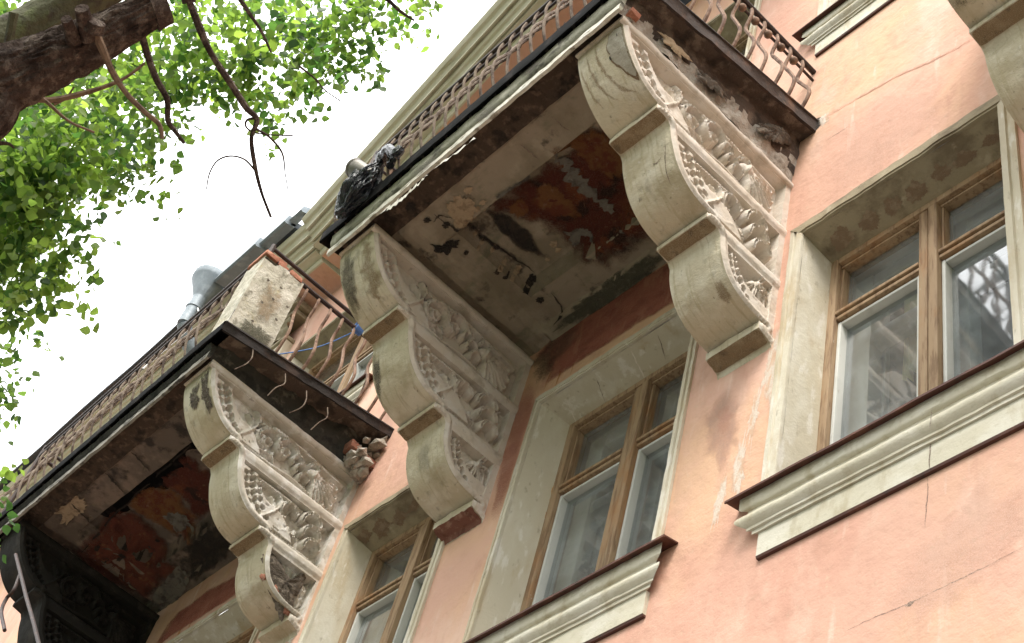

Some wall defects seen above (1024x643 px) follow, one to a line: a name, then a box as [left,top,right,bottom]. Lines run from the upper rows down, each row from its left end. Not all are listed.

spalling [657,31,731,100]
spalling [756,123,793,146]
spalling [380,138,476,214]
peeling [446,187,522,282]
crack [924,412,932,520]